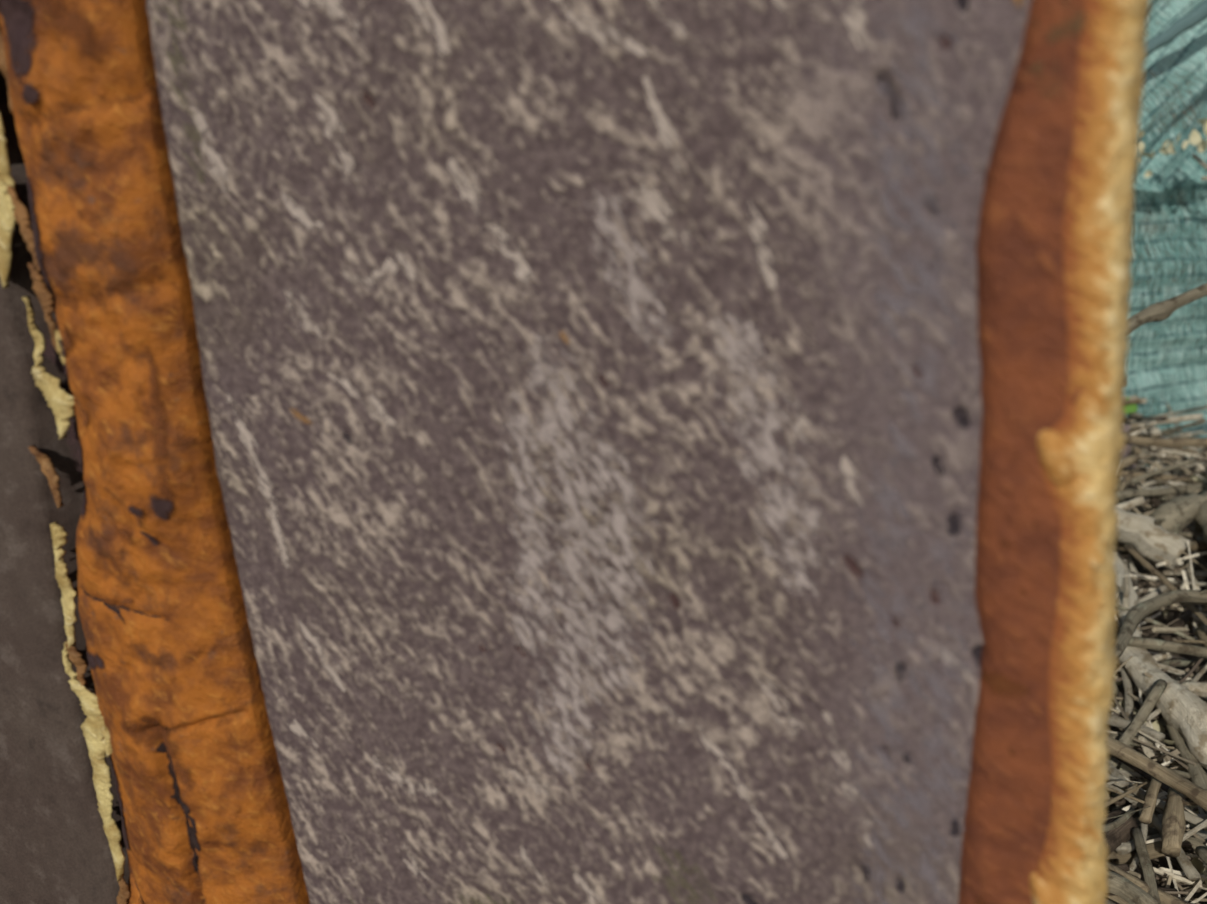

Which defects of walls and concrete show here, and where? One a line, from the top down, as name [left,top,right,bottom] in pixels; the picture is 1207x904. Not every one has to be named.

peeling [0,27,75,440]
peeling [28,444,131,904]
crack [83,591,169,624]
crack [158,722,202,885]